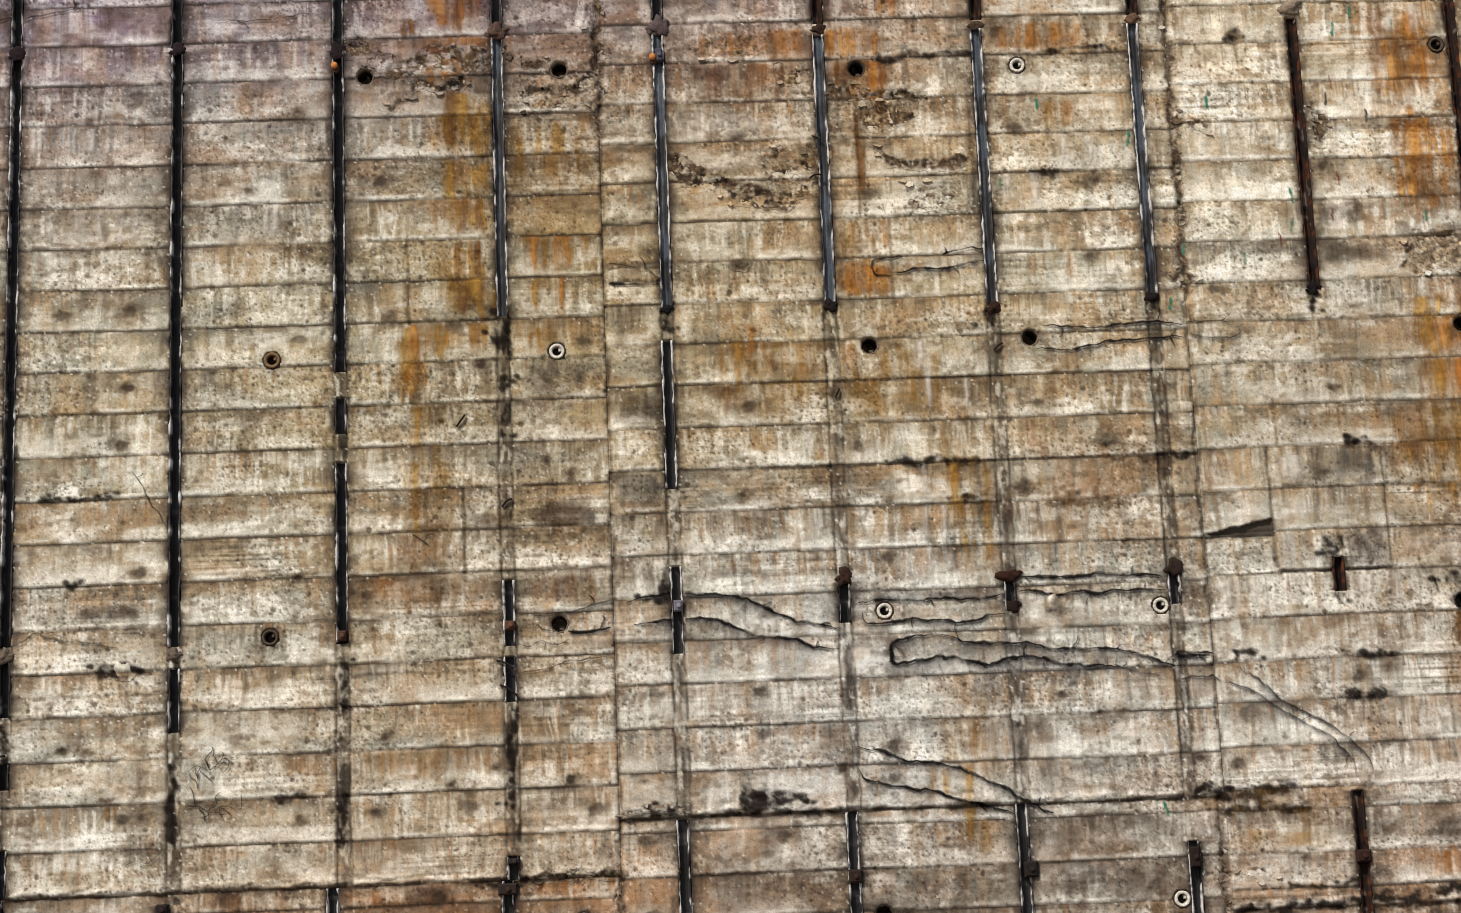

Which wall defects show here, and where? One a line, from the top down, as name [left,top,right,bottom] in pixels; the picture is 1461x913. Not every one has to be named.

rust [401,0,497,344]
rust [1375,10,1454,205]
spalling [1399,228,1461,276]
rust [401,324,449,444]
crack [519,566,1374,773]
crack [858,746,1054,814]